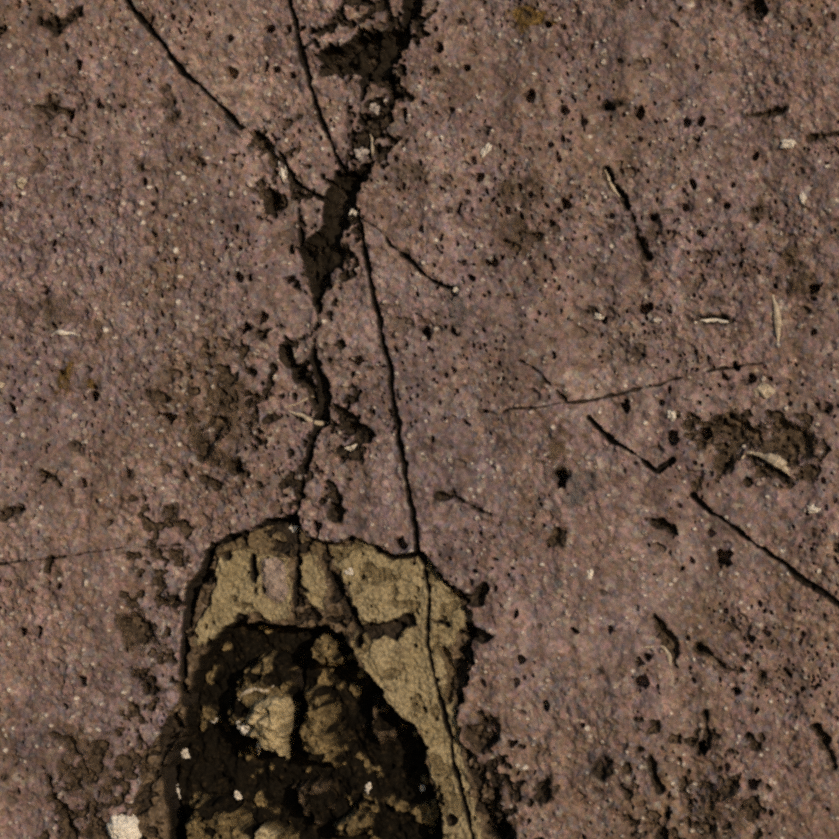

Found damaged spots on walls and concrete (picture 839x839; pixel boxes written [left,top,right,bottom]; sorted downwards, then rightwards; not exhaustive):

crack [125,0,474,839]
crack [486,359,682,474]
crack [706,362,762,372]
crack [0,547,122,565]
crack [690,492,839,607]
spalling [34,489,560,839]